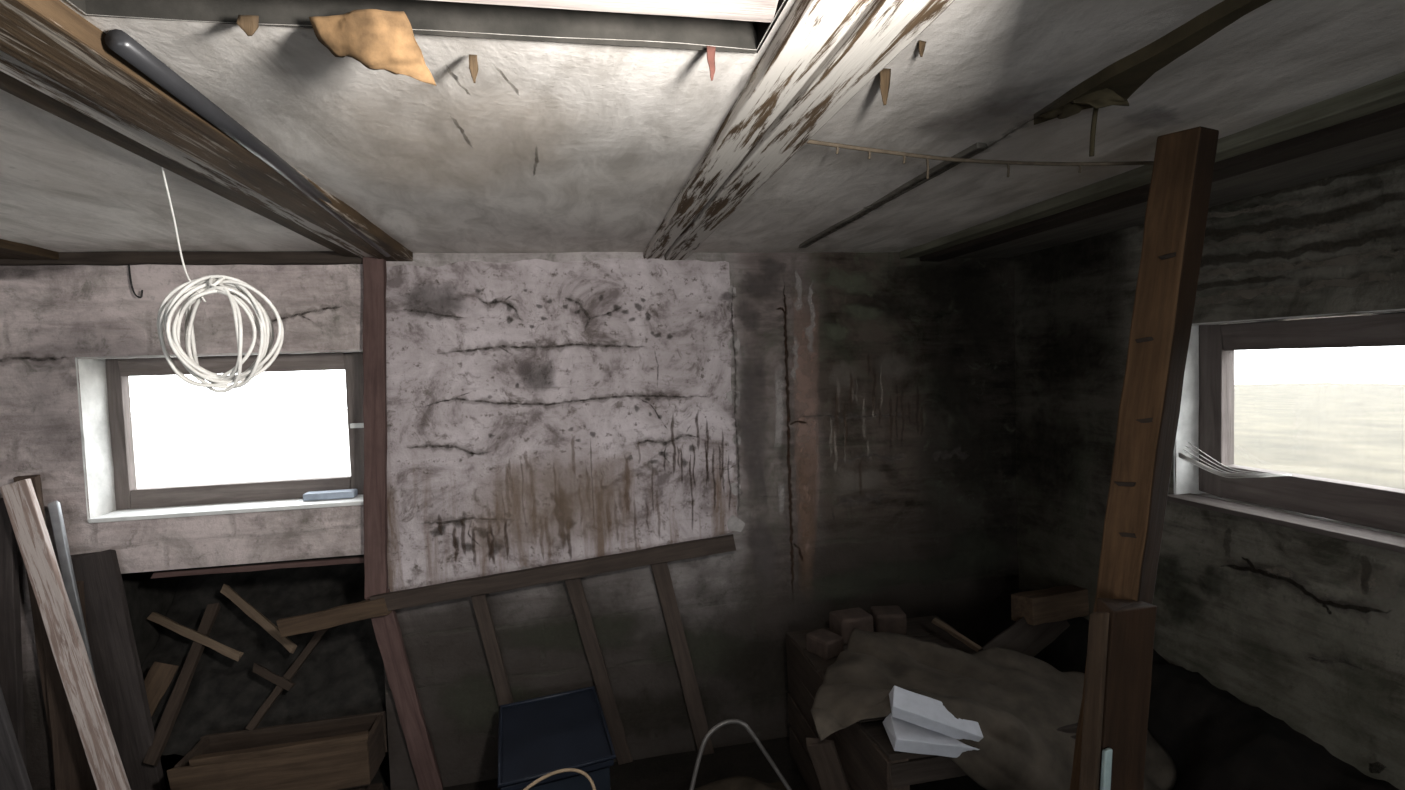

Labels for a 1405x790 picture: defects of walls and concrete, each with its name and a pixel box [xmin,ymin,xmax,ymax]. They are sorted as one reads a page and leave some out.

crack [411,296,516,318]
crack [428,298,691,463]
damp [740,364,784,506]
damp [433,519,500,554]
crack [438,517,497,544]
crack [1227,557,1388,614]